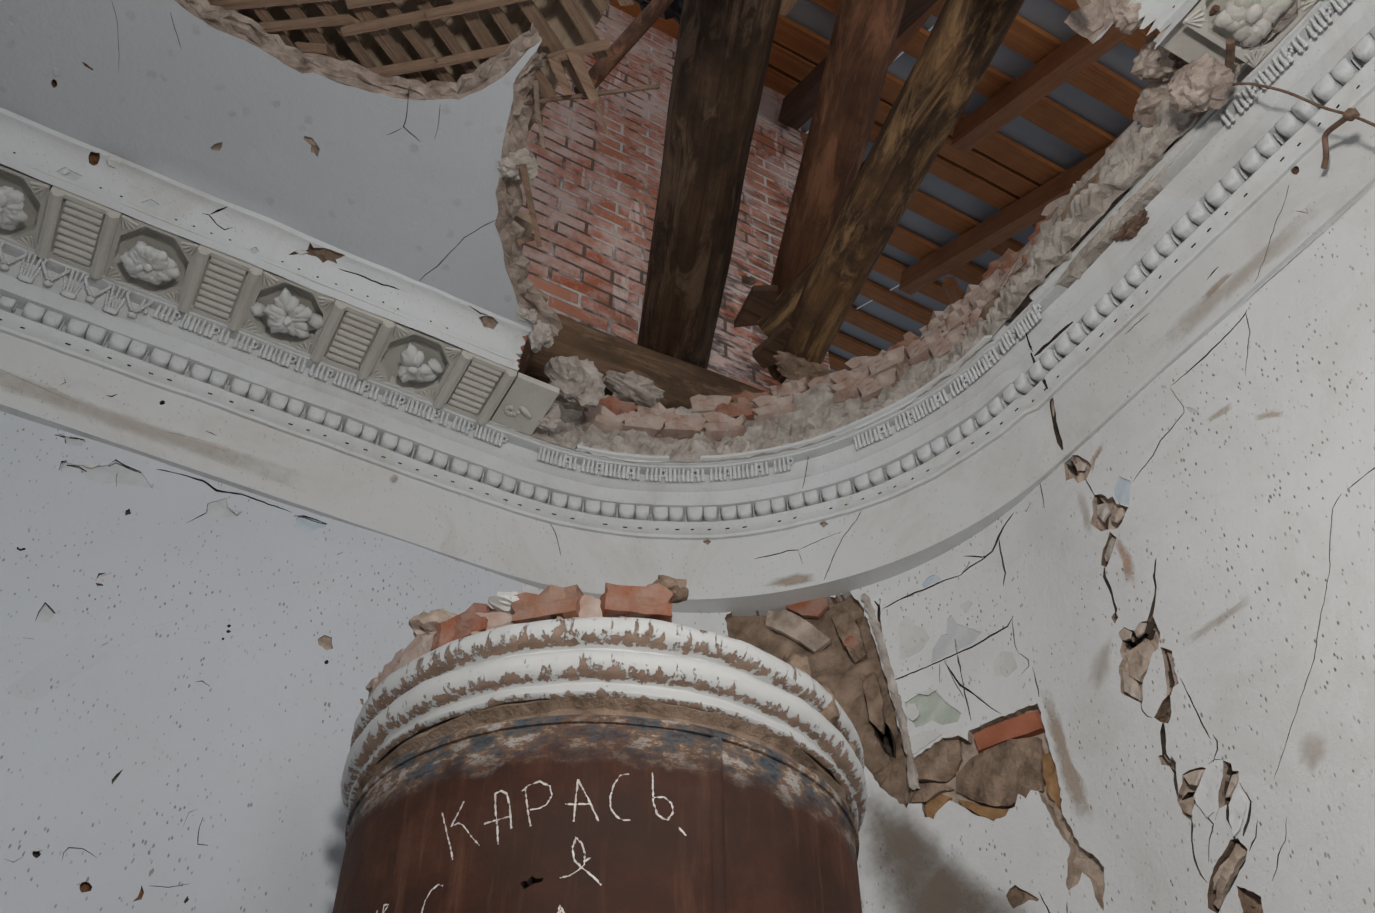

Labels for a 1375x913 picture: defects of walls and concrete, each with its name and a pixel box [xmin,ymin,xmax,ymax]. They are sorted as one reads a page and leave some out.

flaking render [175,0,548,159]
flaking render [289,243,345,264]
flaking render [470,306,498,329]
flaking render [495,177,563,337]
crack [158,469,292,513]
crack [755,512,861,580]
crack [874,186,1375,913]
spalling [725,594,1105,913]